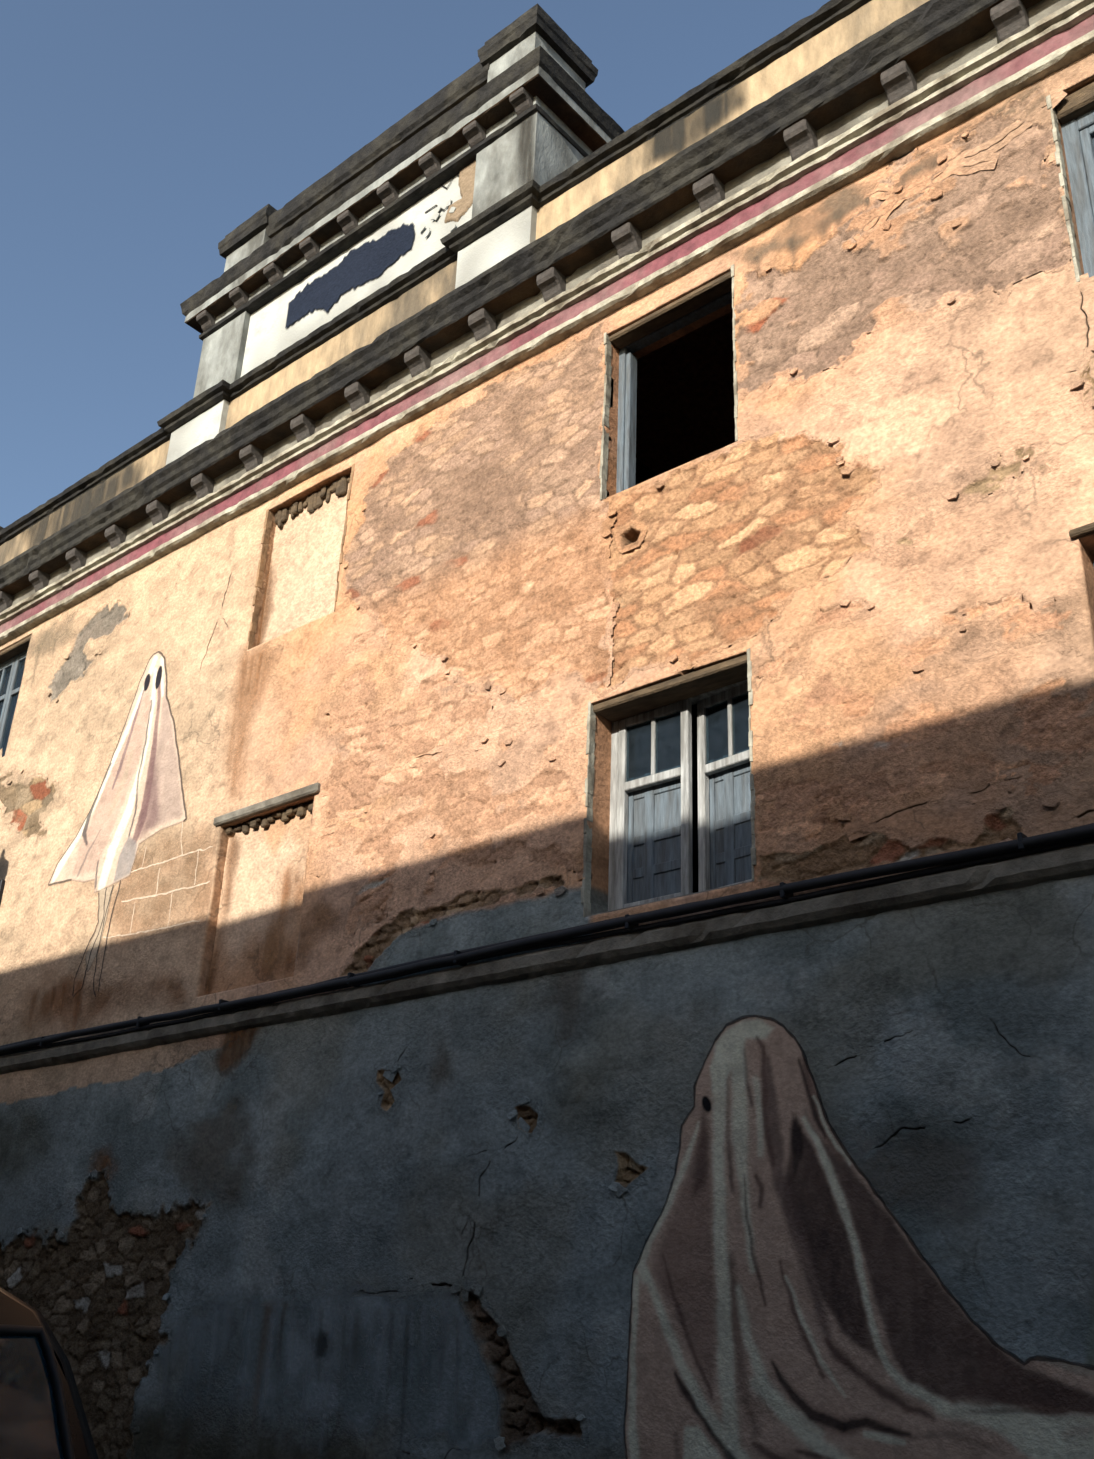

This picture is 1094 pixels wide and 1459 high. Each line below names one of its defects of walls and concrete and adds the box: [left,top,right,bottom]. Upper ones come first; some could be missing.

peeling [734,83,1073,400]
peeling [44,598,130,708]
peeling [225,316,1094,977]
peeling [0,764,65,844]
spalling [371,1061,408,1118]
spalling [507,1096,545,1143]
spalling [607,1141,657,1198]
spalling [0,1163,215,1459]
spalling [449,1280,590,1458]